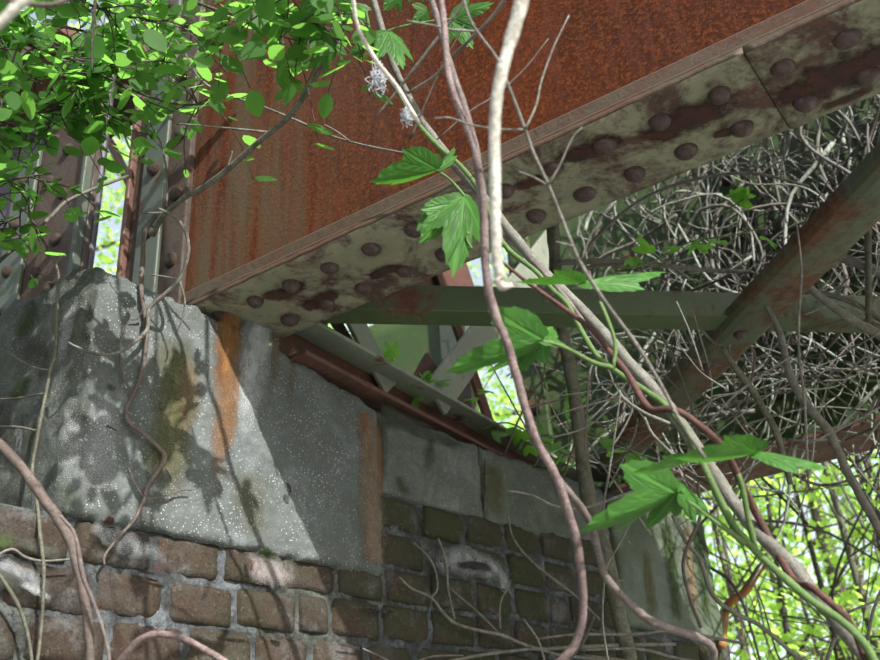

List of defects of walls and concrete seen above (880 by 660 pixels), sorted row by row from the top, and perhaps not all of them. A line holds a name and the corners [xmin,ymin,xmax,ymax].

corrosion [217,312,241,437]
corrosion [361,412,382,564]
leakage [248,547,291,585]